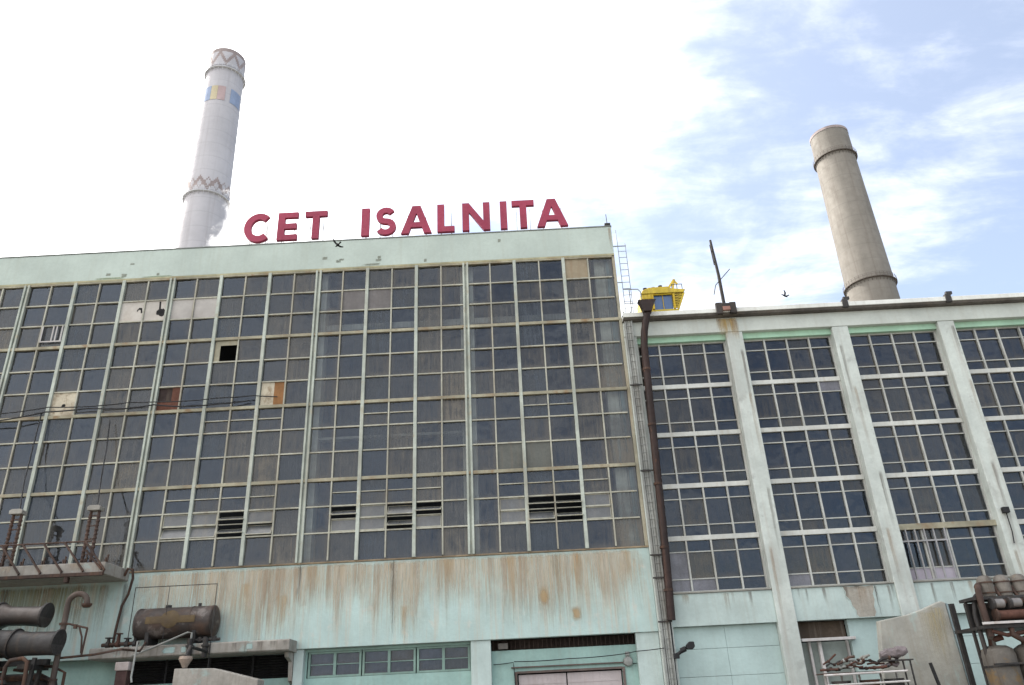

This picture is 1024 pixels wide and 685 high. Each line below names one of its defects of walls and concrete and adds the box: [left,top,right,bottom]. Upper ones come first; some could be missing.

corrosion [257,559,474,614]
spalling [842,585,877,618]